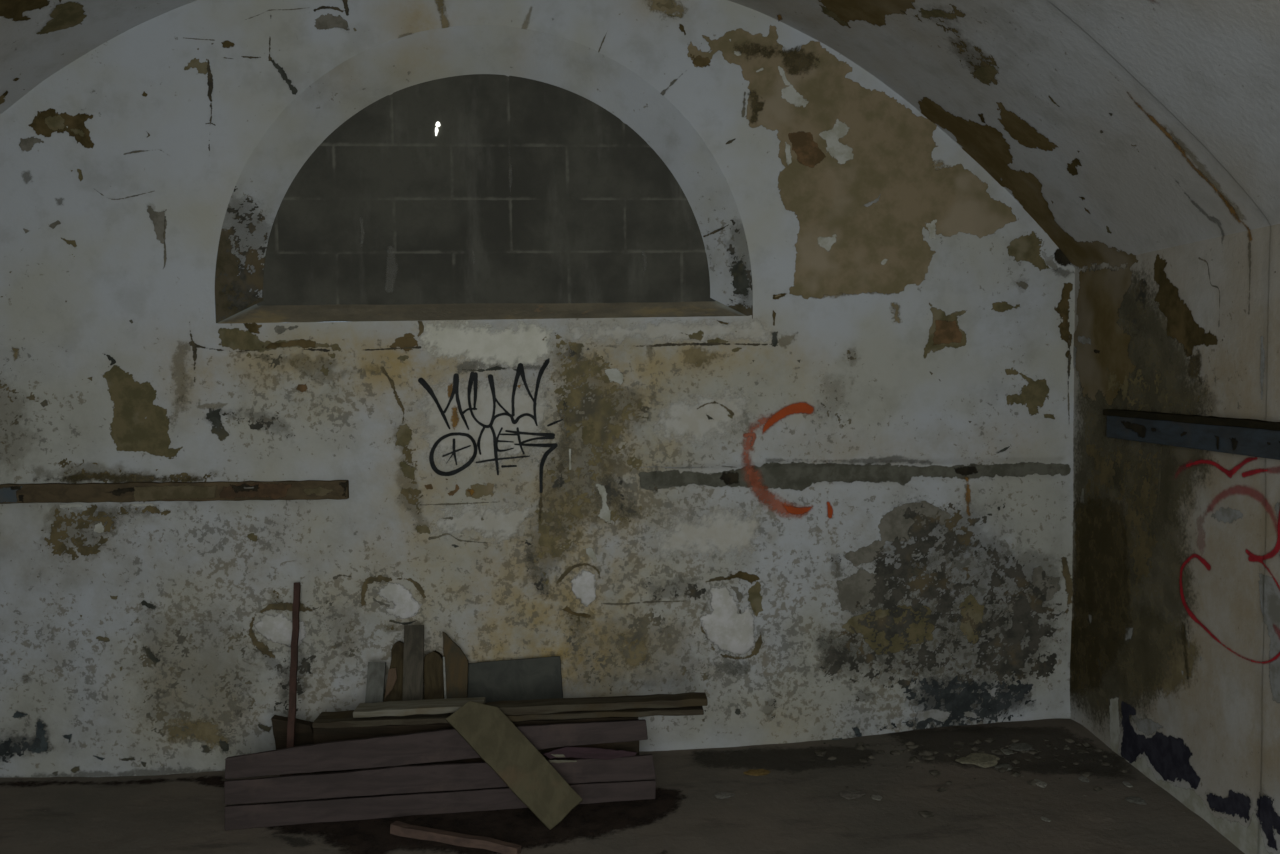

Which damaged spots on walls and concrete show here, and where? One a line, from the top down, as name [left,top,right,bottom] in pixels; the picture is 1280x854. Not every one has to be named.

peeling [0,0,87,35]
peeling [19,108,94,152]
peeling [657,0,1223,405]
leakage [635,220,778,368]
peeling [102,354,183,459]
leakage [457,333,658,594]
leakage [697,401,734,430]
peeling [1005,367,1055,419]
leakage [815,272,1280,851]
leakage [567,575,706,694]
leakage [693,727,874,772]
peeling [1109,697,1273,854]